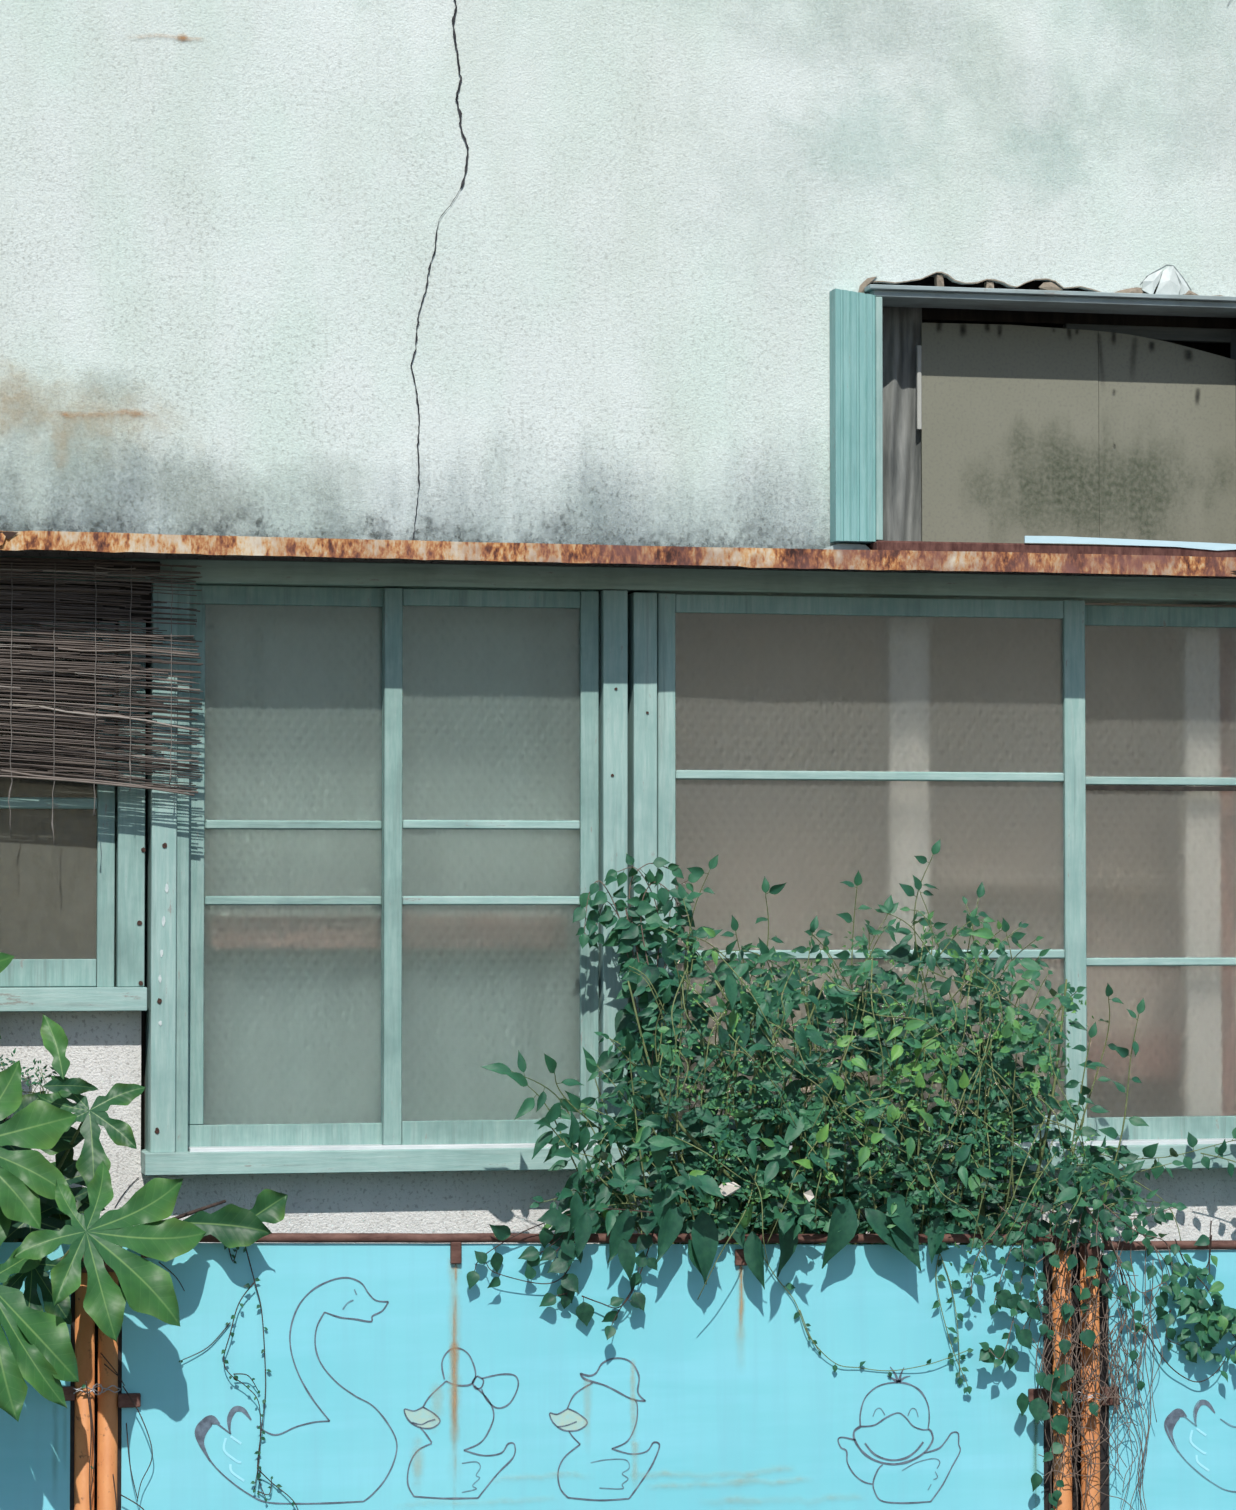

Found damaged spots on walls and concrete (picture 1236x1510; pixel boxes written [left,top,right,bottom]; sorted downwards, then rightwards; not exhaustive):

leakage [0,488,123,532]
crack [410,0,469,540]